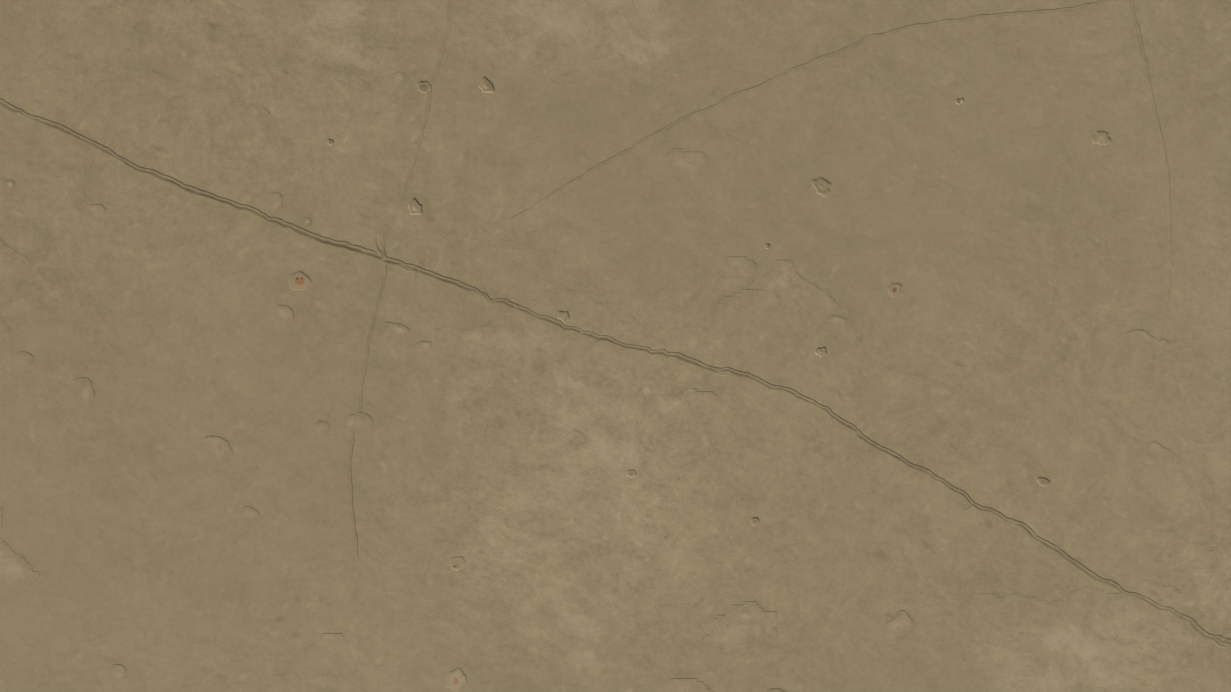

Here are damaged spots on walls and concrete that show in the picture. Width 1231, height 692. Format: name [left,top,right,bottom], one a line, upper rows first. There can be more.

crack [0,99,1231,650]